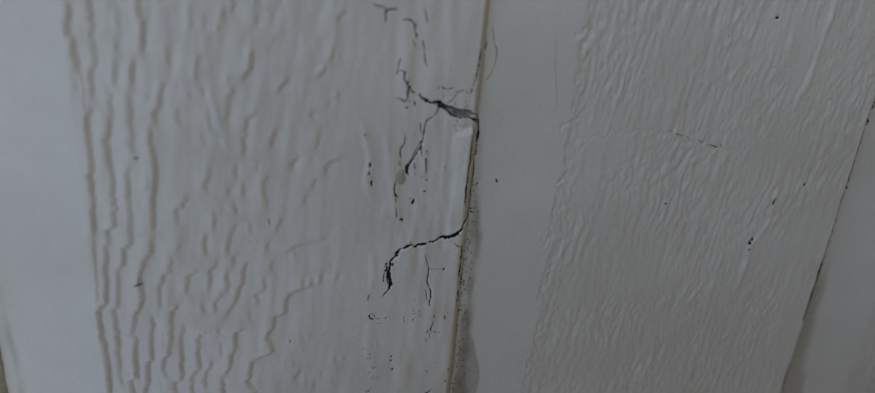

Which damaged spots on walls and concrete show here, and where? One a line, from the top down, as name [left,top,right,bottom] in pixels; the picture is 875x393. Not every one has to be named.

crack [373,3,487,218]
crack [368,209,469,333]